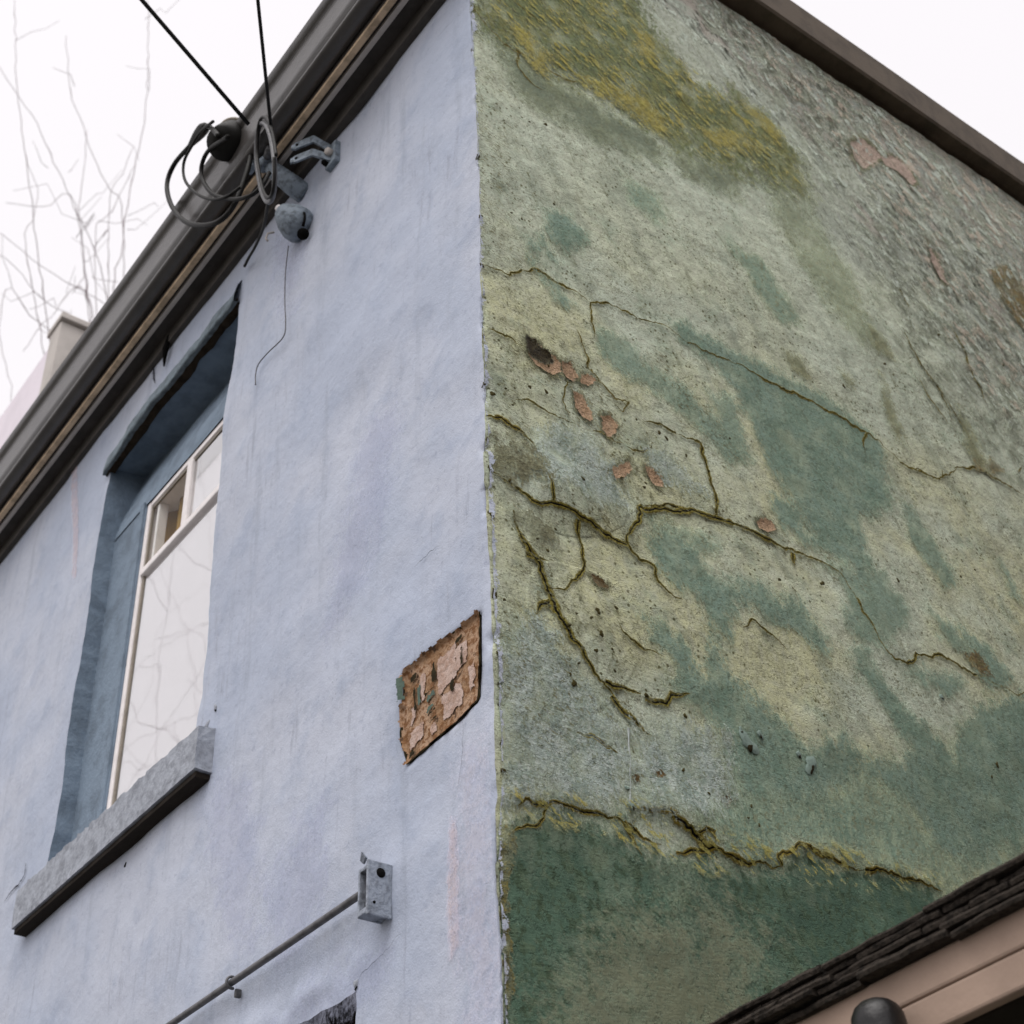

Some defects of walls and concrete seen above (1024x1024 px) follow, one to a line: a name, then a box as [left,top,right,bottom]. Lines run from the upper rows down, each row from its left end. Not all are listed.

leakage [491,36,746,203]
leakage [727,242,801,328]
peeling [635,0,1024,486]
spalling [522,324,623,443]
spalling [607,453,669,491]
crack [487,265,1024,735]
spalling [395,609,482,765]
leakage [494,314,1024,1024]
crack [511,796,943,892]